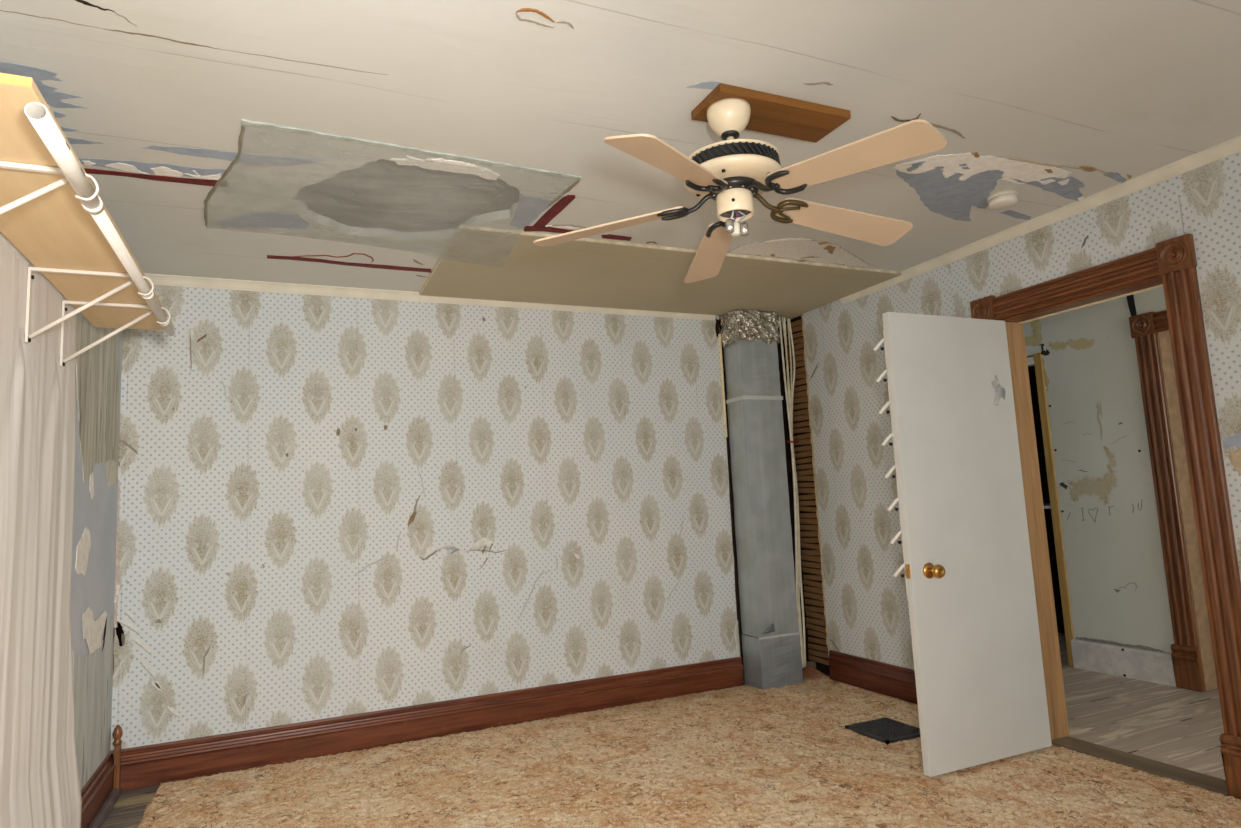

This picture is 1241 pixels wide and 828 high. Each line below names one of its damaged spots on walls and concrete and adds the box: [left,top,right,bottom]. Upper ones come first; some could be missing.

crack [0,0,388,75]
peeling [0,62,332,180]
peeling [894,152,1132,221]
peeling [75,527,91,575]
peeling [82,585,120,654]